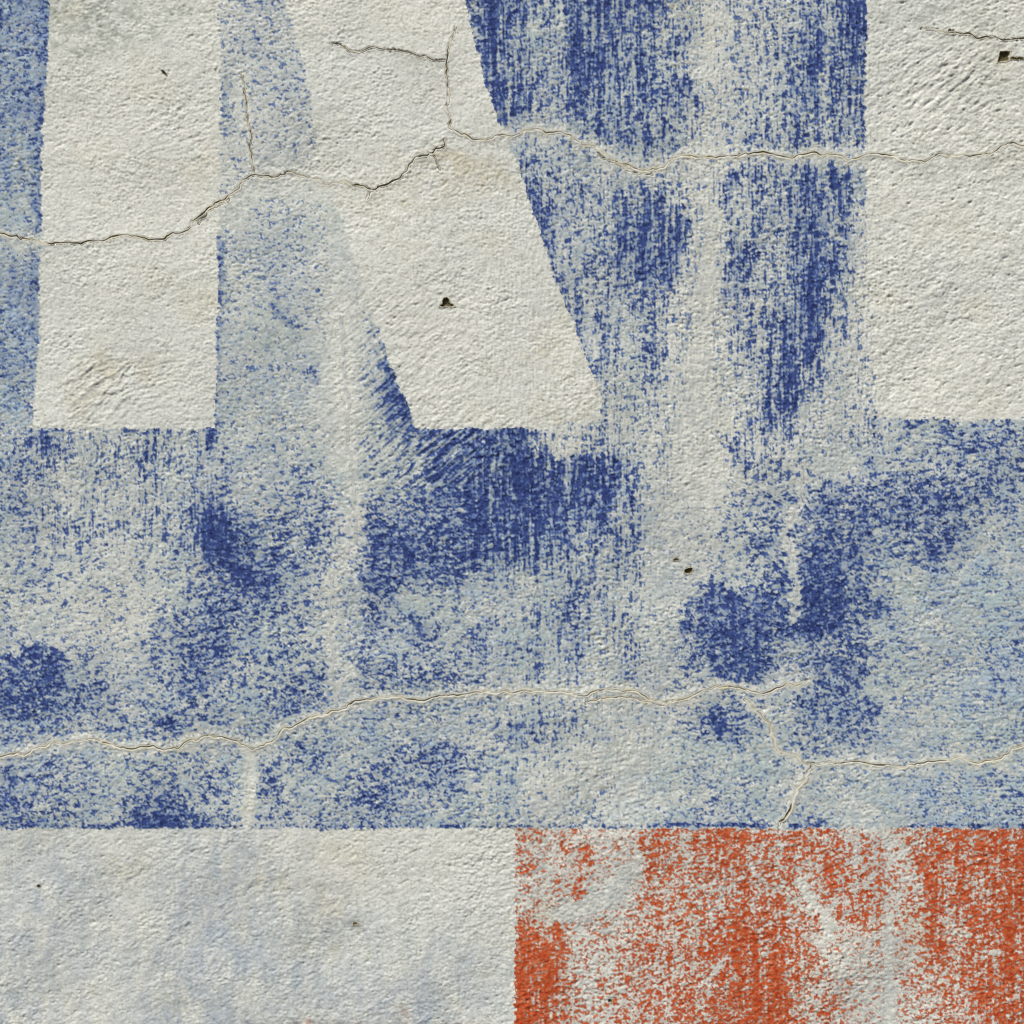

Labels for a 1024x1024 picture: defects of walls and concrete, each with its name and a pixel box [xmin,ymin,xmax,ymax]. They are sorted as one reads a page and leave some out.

crack [0,25,1024,246]
crack [339,317,349,443]
crack [0,579,1024,826]